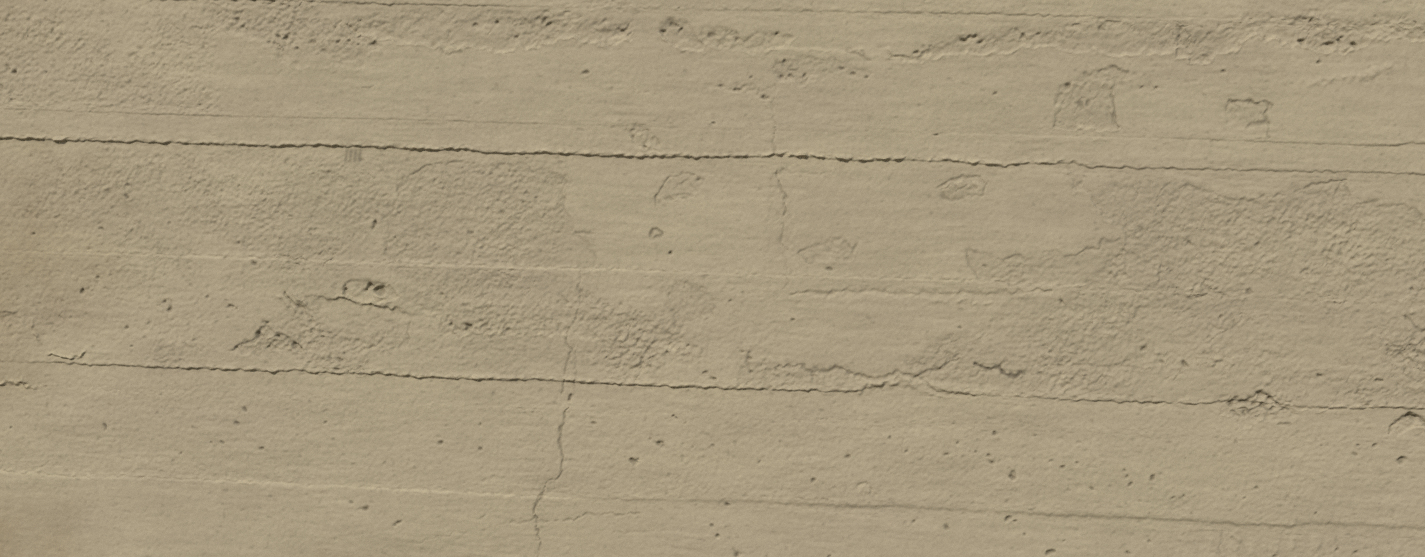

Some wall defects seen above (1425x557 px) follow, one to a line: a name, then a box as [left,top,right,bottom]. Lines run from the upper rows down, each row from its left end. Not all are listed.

crack [498,175,673,557]